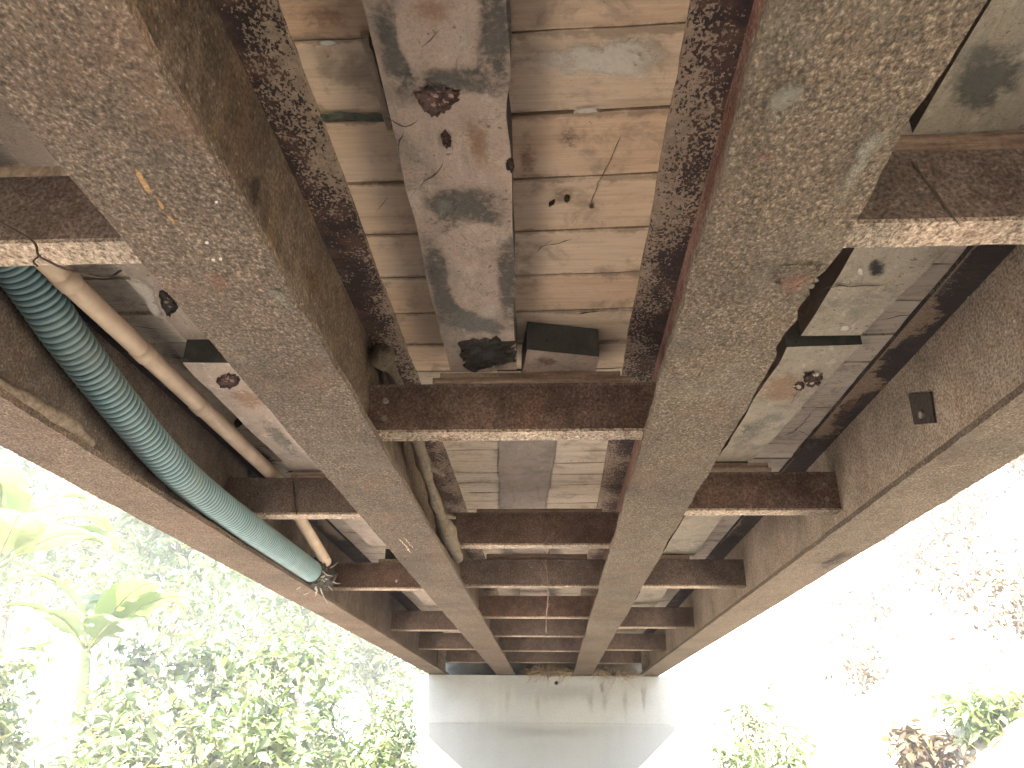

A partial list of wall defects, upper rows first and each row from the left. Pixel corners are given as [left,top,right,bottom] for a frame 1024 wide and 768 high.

leakage [957,48,1019,108]
spalling [413,78,460,118]
leakage [426,190,499,228]
spalling [158,290,179,317]
spalling [216,373,241,390]
spalling [793,370,823,391]